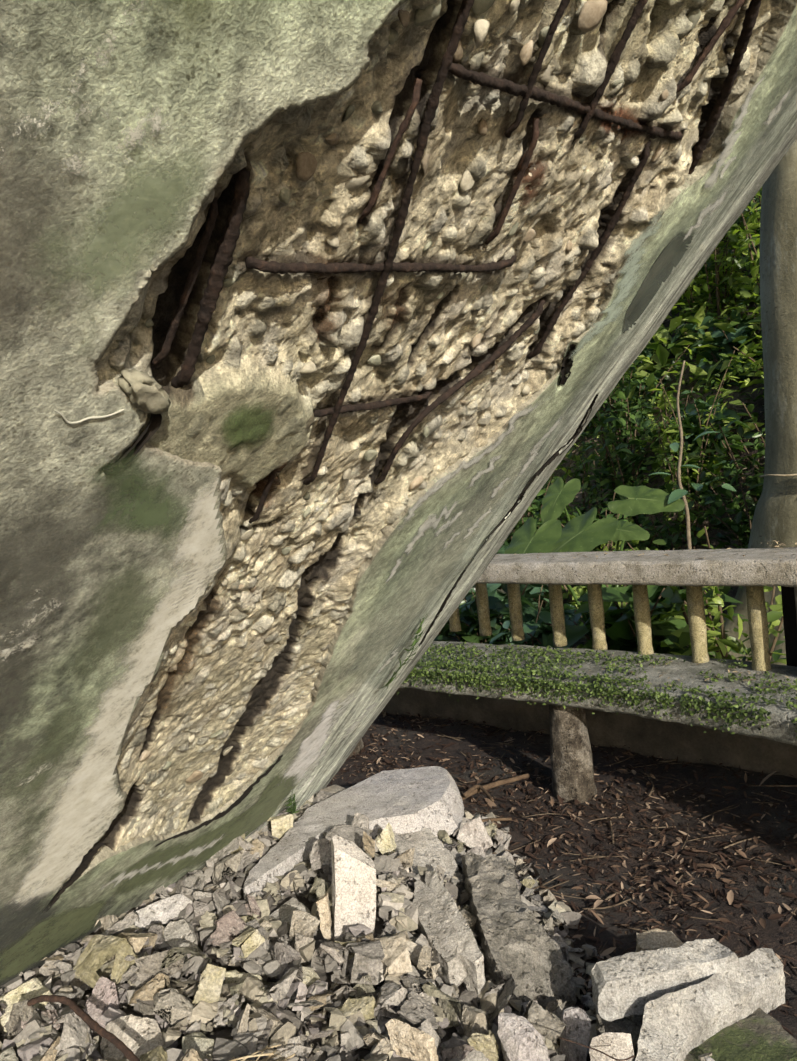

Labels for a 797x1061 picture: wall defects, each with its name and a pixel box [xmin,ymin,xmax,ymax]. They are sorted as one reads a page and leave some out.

peeling [0,30,117,159]
corrosion [676,0,762,175]
corrosion [151,0,683,485]
spalling [88,0,782,867]
damp [0,478,225,992]
crack [155,755,283,847]
damp [283,701,339,792]